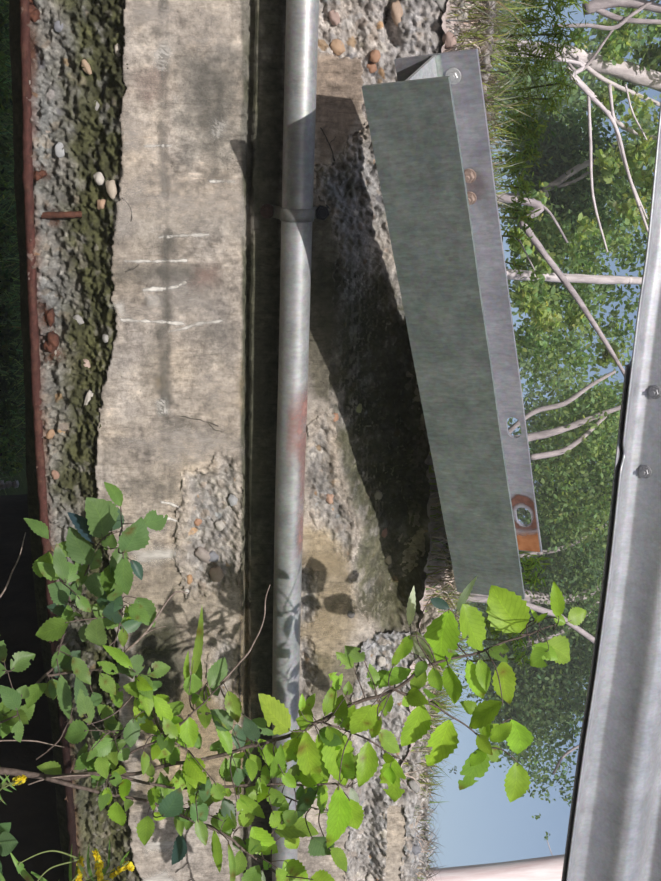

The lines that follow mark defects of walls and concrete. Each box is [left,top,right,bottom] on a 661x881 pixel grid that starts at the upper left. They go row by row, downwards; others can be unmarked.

spalling [318,0,496,96]
corrosion [19,0,82,556]
spalling [21,0,135,556]
spalling [169,431,247,601]
spalling [304,98,439,881]
damp [338,273,429,516]
corrosion [56,696,78,879]
spalling [49,537,142,881]